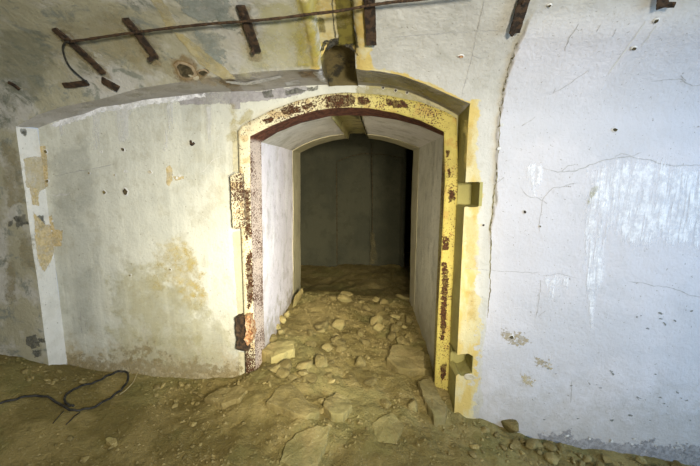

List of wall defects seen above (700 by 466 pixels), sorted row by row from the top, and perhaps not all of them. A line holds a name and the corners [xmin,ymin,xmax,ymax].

rust [281,94,371,115]
rust [386,98,409,109]
rust [244,189,252,240]
rust [245,249,255,309]
rust [440,262,449,340]